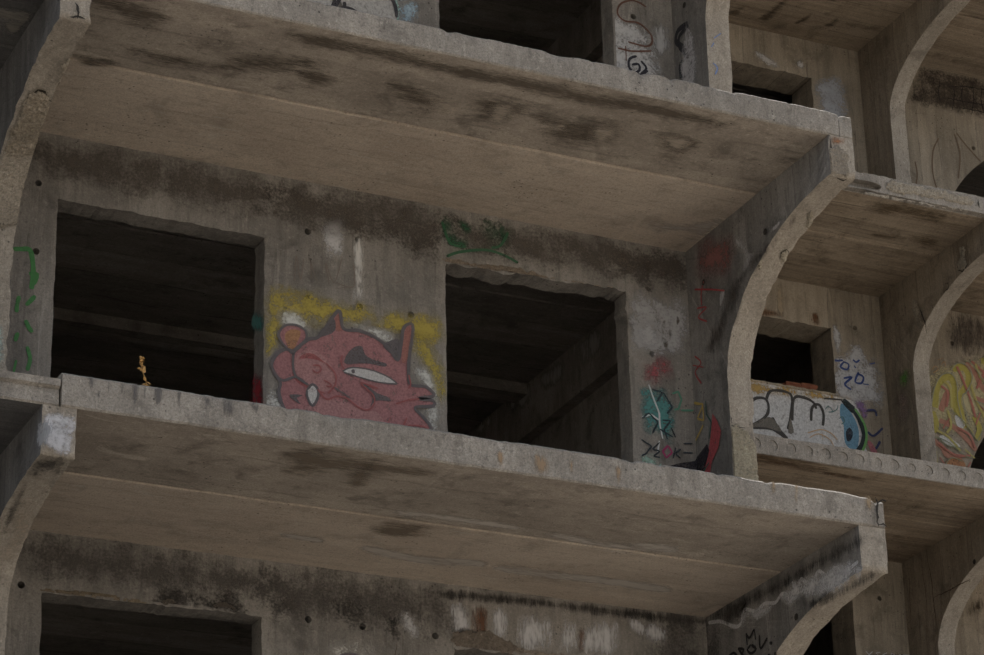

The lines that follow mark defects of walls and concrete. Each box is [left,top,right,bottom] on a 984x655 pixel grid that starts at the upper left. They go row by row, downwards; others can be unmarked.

water stain [93,0,168,25]
water stain [219,58,329,84]
water stain [292,34,726,126]
mould [912,68,984,114]
spalling [0,89,52,228]
water stain [33,140,686,295]
spalling [865,179,980,211]
water stain [286,450,428,486]
water stain [1,491,873,655]